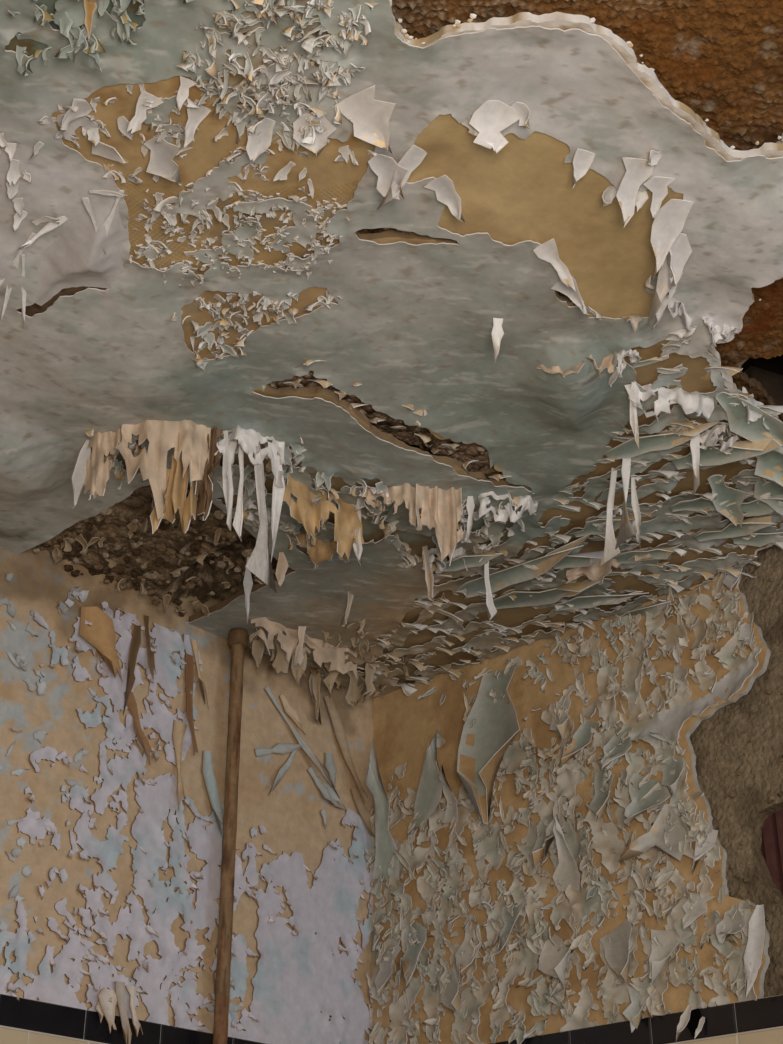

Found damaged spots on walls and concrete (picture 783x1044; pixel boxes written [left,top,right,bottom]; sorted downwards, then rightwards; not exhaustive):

peeling [5,0,146,76]
peeling [0,133,44,232]
crack [358,227,415,235]
peeling [33,0,783,696]
crack [267,359,513,481]
peeling [345,656,391,708]
peeling [0,586,224,1044]
peeling [228,617,375,1044]
peeling [366,565,770,1044]
spalling [760,791,783,904]